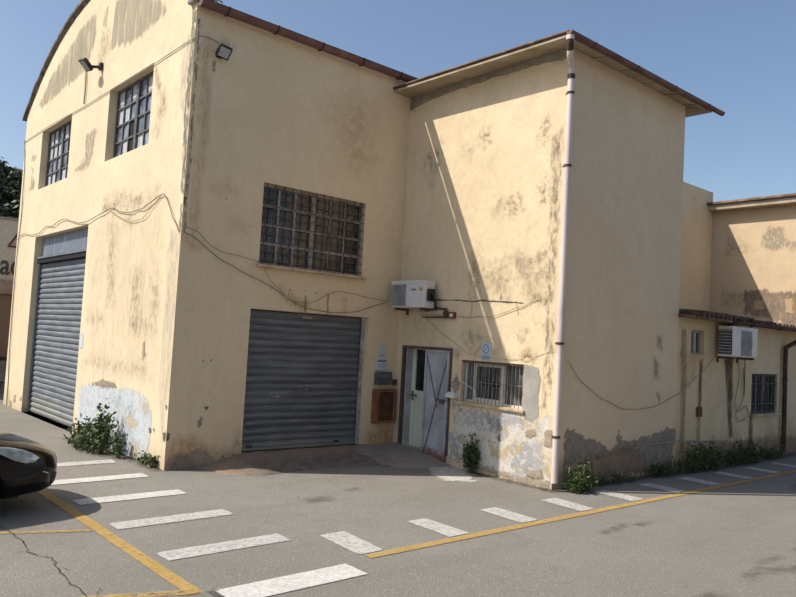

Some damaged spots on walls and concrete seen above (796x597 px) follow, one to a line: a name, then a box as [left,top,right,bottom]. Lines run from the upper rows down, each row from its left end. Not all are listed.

flaking render [764,227,796,250]
flaking render [744,289,796,325]
peeling [78,379,170,460]
peeling [448,402,553,489]
flaking render [563,427,676,488]
crack [0,525,87,597]